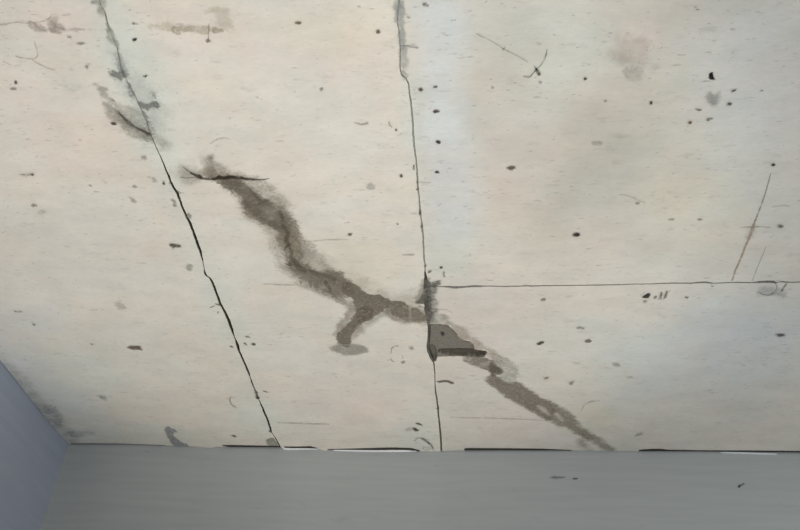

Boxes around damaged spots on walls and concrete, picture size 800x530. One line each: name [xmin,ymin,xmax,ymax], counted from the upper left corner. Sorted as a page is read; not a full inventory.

crack [99,0,280,446]
leakage [205,157,445,355]
spalling [427,324,487,362]
leakage [464,353,614,450]
crack [395,0,800,451]